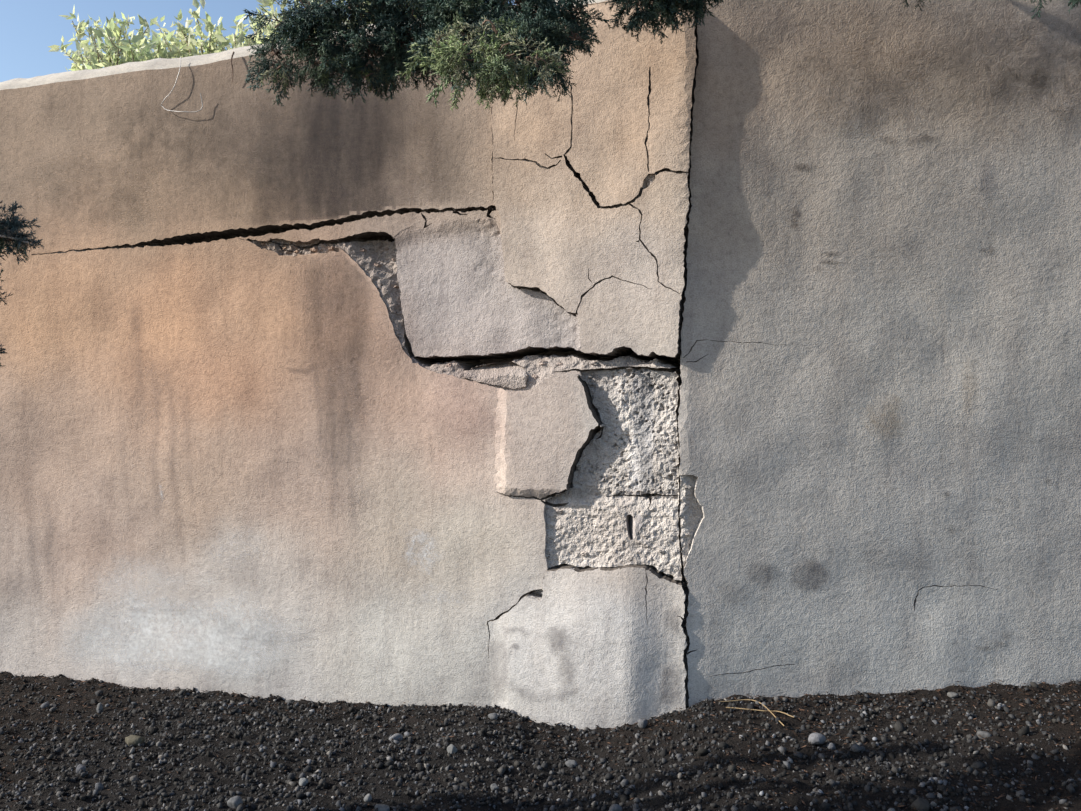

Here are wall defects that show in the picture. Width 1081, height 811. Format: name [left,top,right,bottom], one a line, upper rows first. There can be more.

flaking render [239,217,581,367]
crack [32,19,794,707]
flaking render [544,361,704,578]
crack [914,585,997,611]